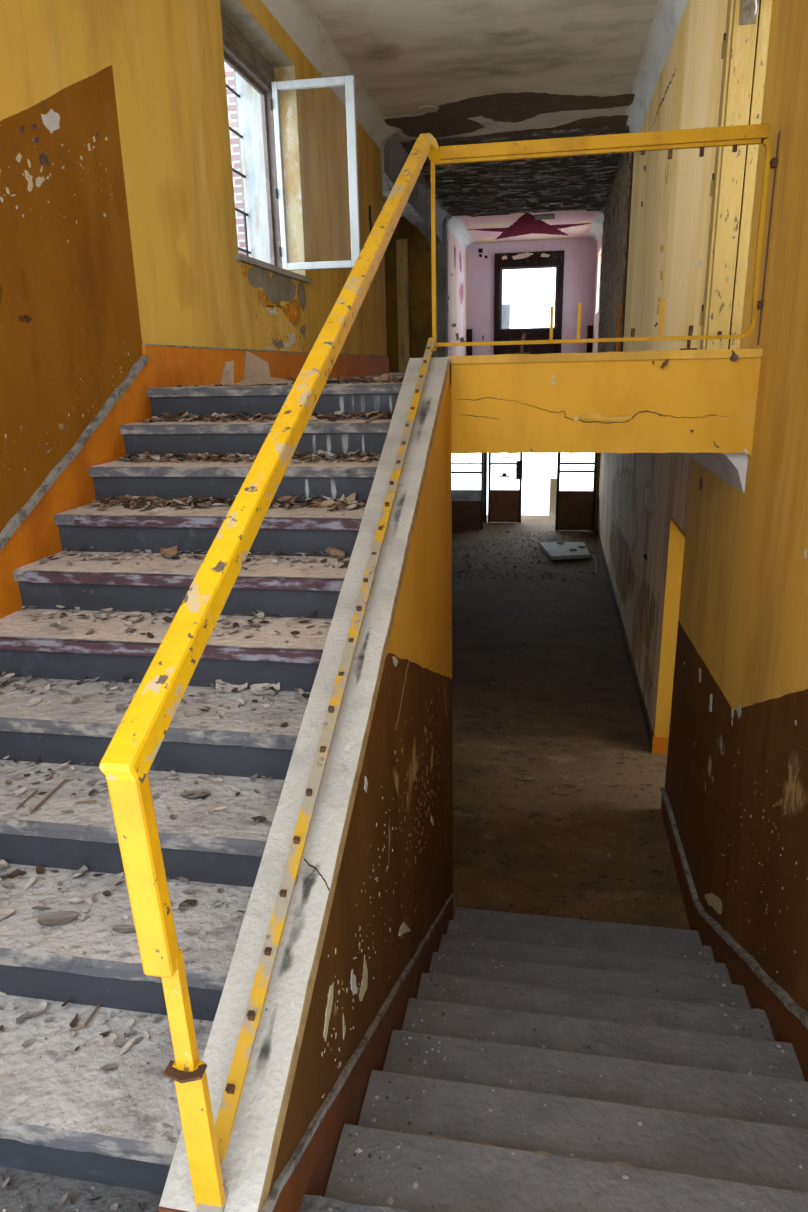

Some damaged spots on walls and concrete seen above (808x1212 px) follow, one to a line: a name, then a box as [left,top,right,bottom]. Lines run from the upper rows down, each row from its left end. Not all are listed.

flaking render [384,92,635,138]
peeling [0,109,112,226]
flaking render [247,266,306,351]
crack [452,397,728,424]